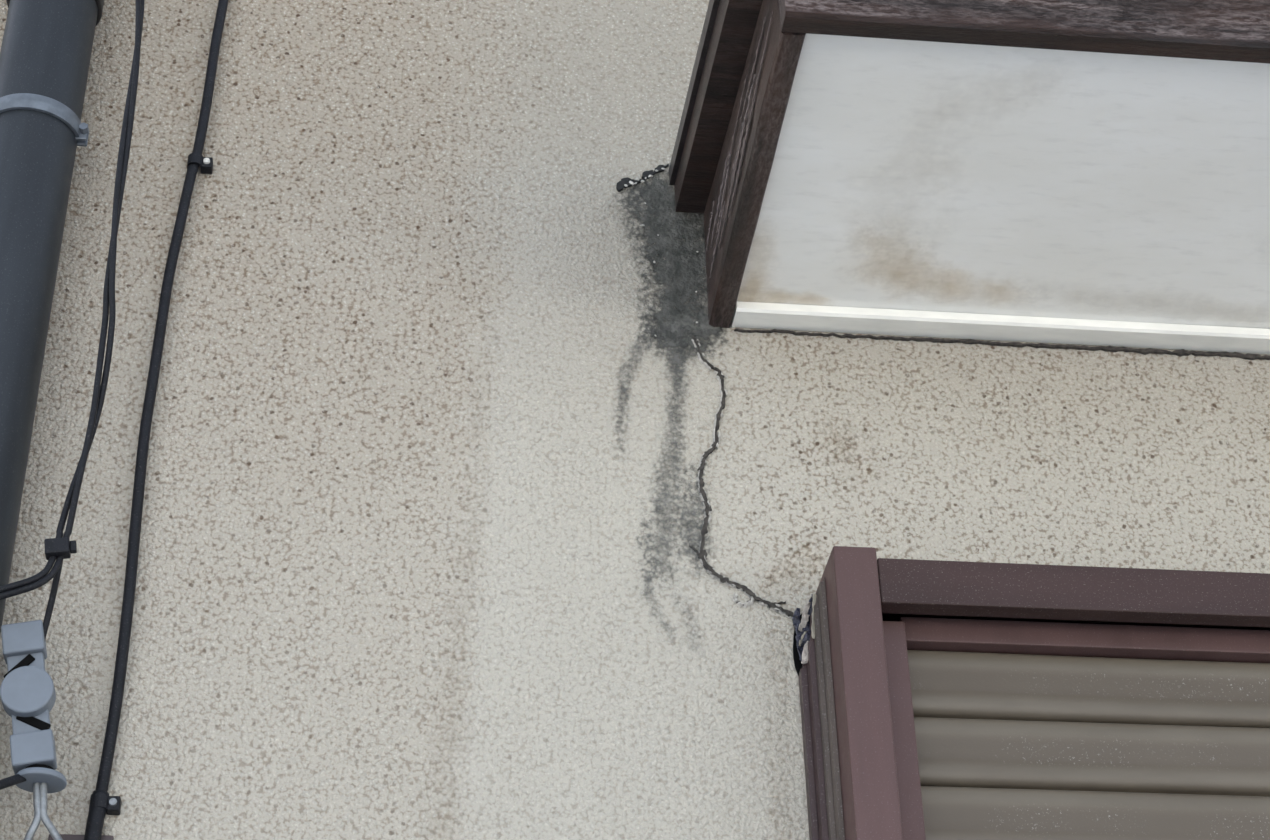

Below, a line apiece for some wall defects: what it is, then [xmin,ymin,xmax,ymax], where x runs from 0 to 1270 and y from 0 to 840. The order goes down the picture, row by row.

damp [617,172,727,595]
crack [689,335,795,629]